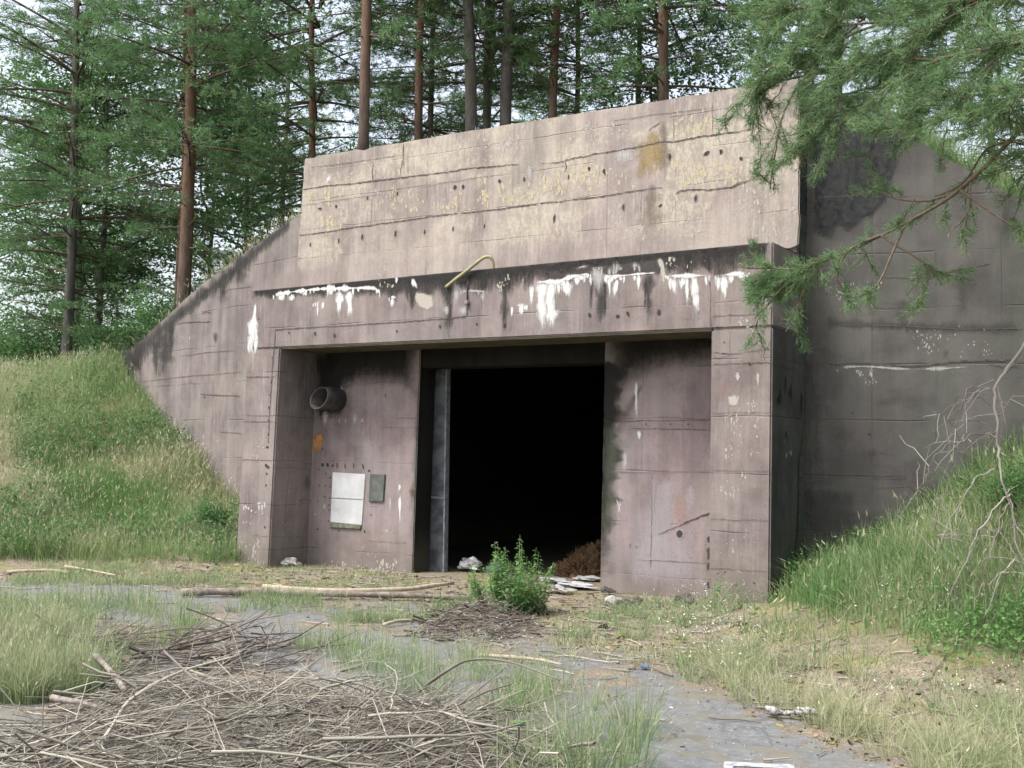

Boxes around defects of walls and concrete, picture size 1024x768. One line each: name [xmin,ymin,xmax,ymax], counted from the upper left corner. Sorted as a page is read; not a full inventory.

water stain [785,111,899,264]
water stain [121,222,290,376]
water stain [247,243,767,355]